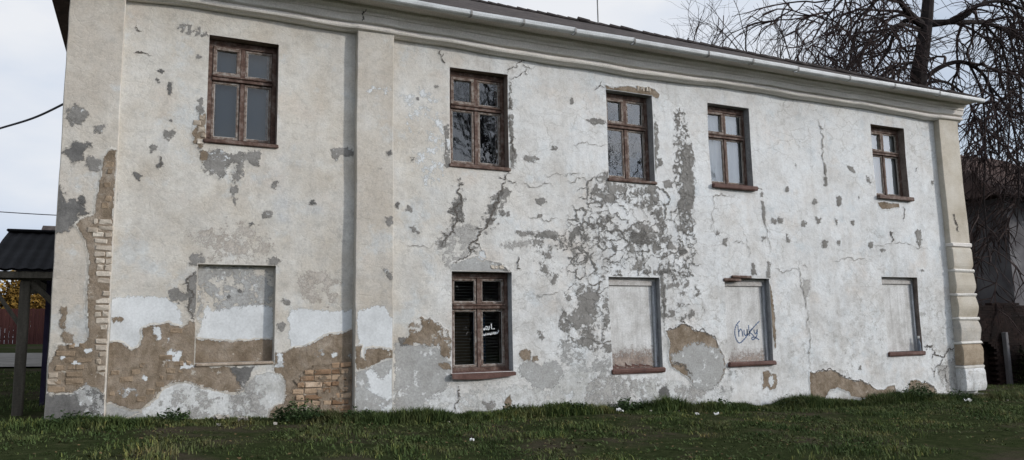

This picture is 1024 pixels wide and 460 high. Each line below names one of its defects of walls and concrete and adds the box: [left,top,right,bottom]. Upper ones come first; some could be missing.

spalling [45,97,452,420]
crack [411,60,812,368]
spalling [518,108,737,393]
spalling [761,368,779,393]
spalling [808,366,937,400]